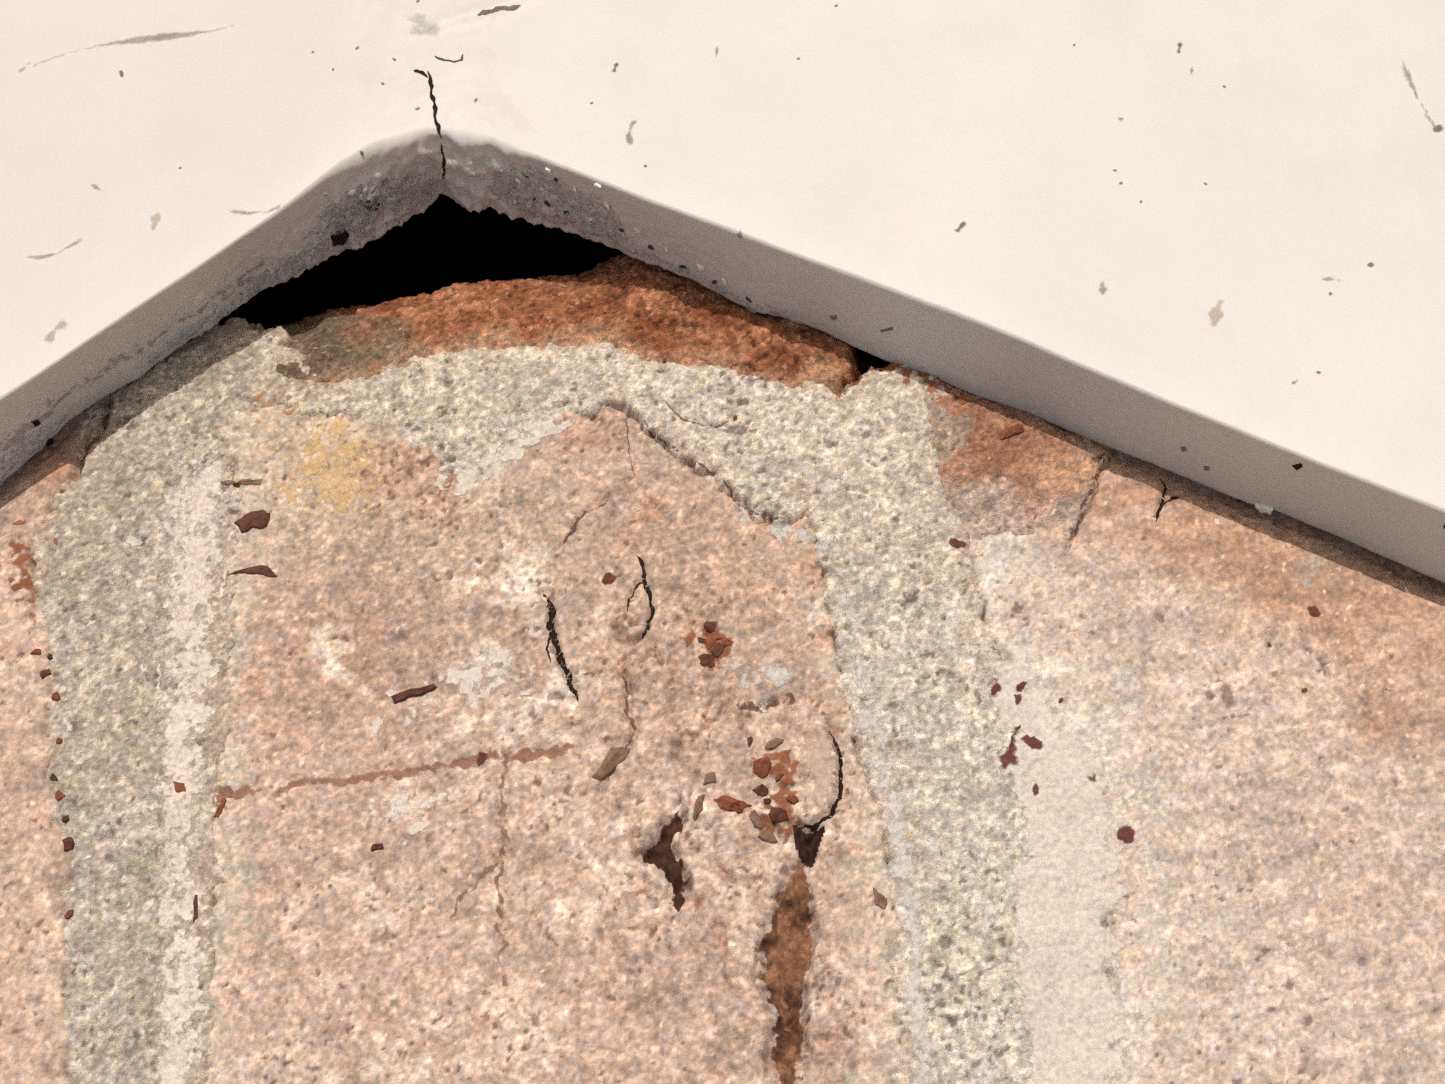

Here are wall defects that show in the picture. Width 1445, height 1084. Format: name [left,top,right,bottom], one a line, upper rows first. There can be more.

crack [413,54,463,179]
spalling [220,479,262,487]
spalling [234,510,270,533]
crack [627,555,655,640]
crack [542,594,578,701]